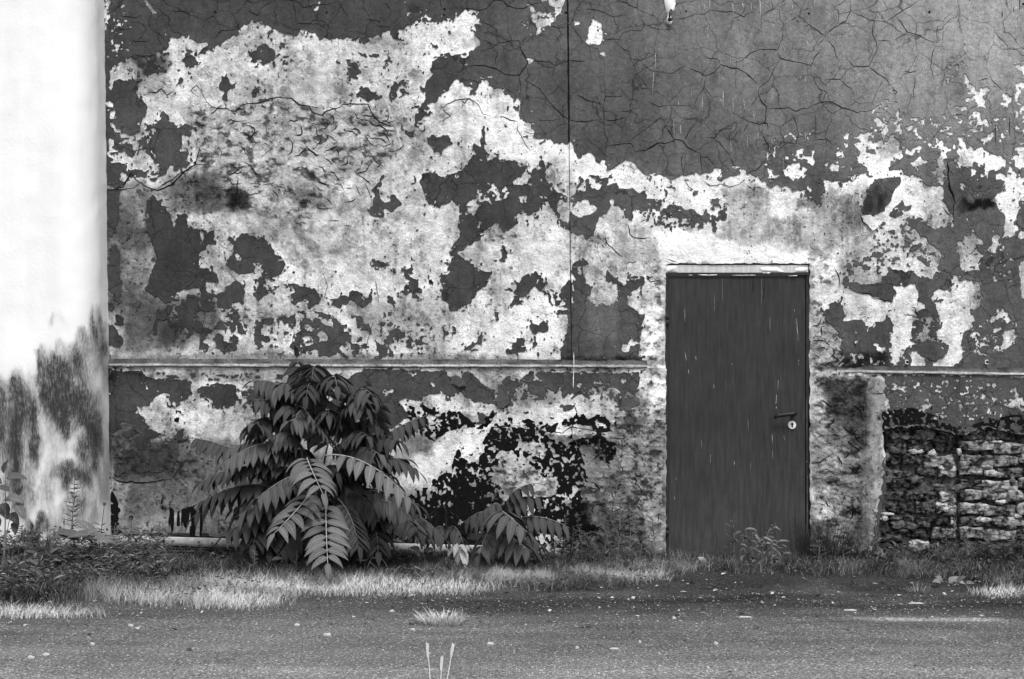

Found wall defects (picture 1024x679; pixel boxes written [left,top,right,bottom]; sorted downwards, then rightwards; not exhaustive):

water stain [0,312,107,545]
crack [107,80,403,227]
spalling [104,0,1024,557]
crack [442,0,951,360]